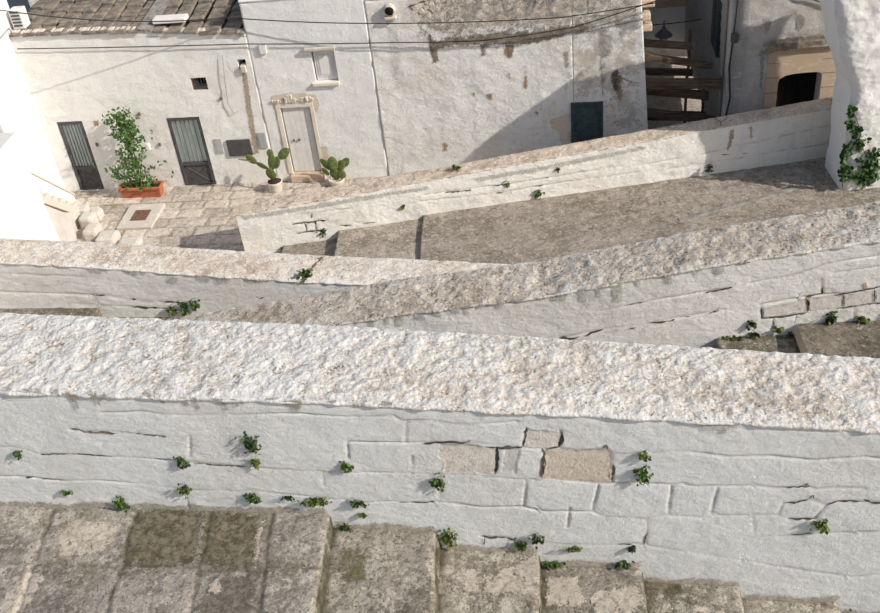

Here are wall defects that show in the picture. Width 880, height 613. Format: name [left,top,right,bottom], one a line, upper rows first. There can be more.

flaking render [410,0,586,29]
peeling [763,282,880,317]
crack [424,428,564,477]
peeling [524,429,614,483]
crack [787,484,880,535]